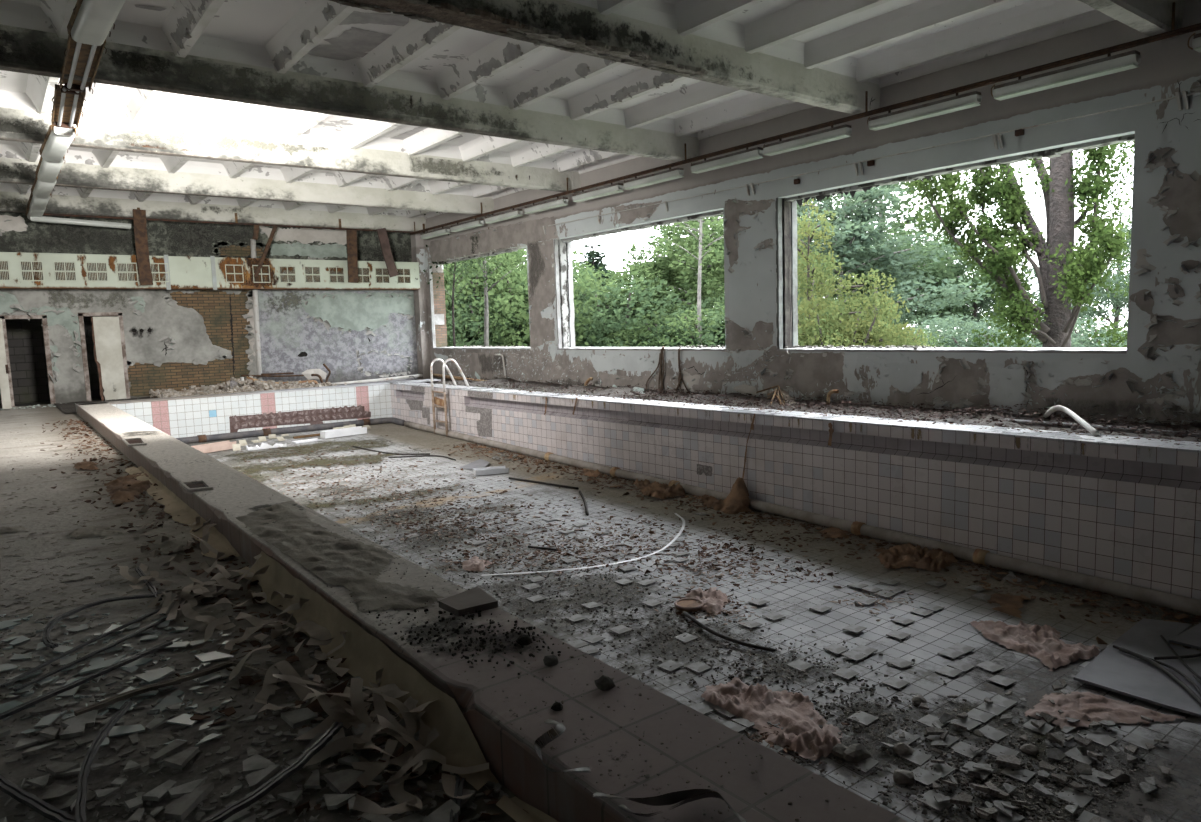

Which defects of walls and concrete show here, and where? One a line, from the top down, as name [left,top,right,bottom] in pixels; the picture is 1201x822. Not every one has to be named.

leakage [307,11,409,61]
spalling [271,0,708,114]
mould [466,0,751,79]
mould [0,119,47,135]
leakage [84,88,123,105]
leakage [0,163,37,180]
peeling [0,215,28,236]
mould [0,215,134,253]
peeling [723,197,775,273]
peeling [885,147,1201,425]
flaking render [127,290,256,397]
peeling [300,291,430,425]